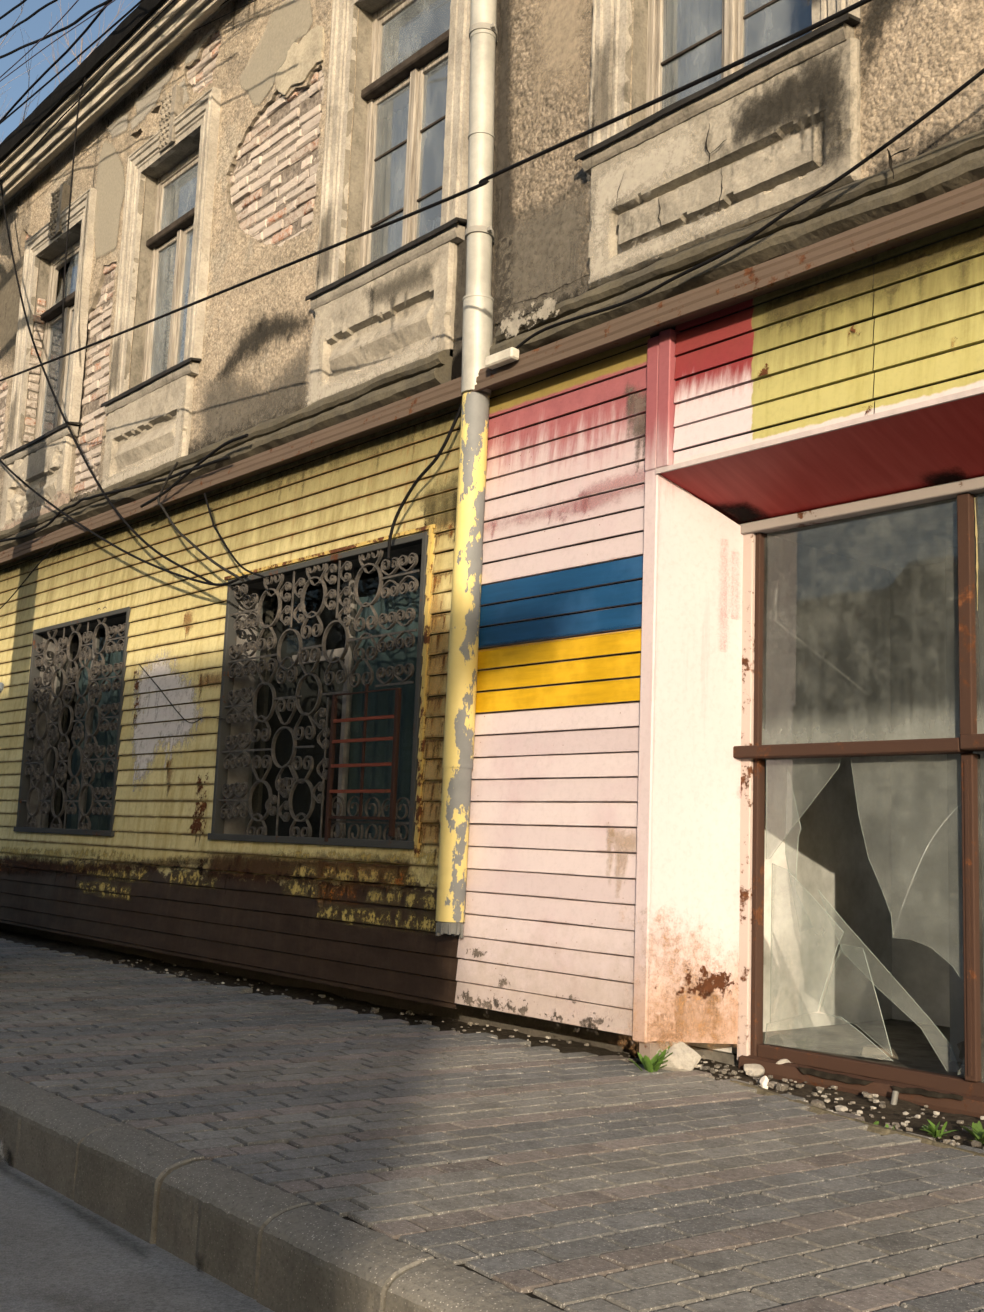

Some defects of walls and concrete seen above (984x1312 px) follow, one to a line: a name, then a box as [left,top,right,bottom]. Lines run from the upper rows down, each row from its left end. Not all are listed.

water stain [856,0,899,85]
flaking render [230,25,325,246]
water stain [733,48,850,165]
flaking render [0,263,185,537]
peeling [132,649,203,792]
peeling [1,848,214,900]
peeling [288,851,437,931]
peeling [455,974,528,1016]
peeling [545,994,610,1034]
corrosion [655,934,735,1046]